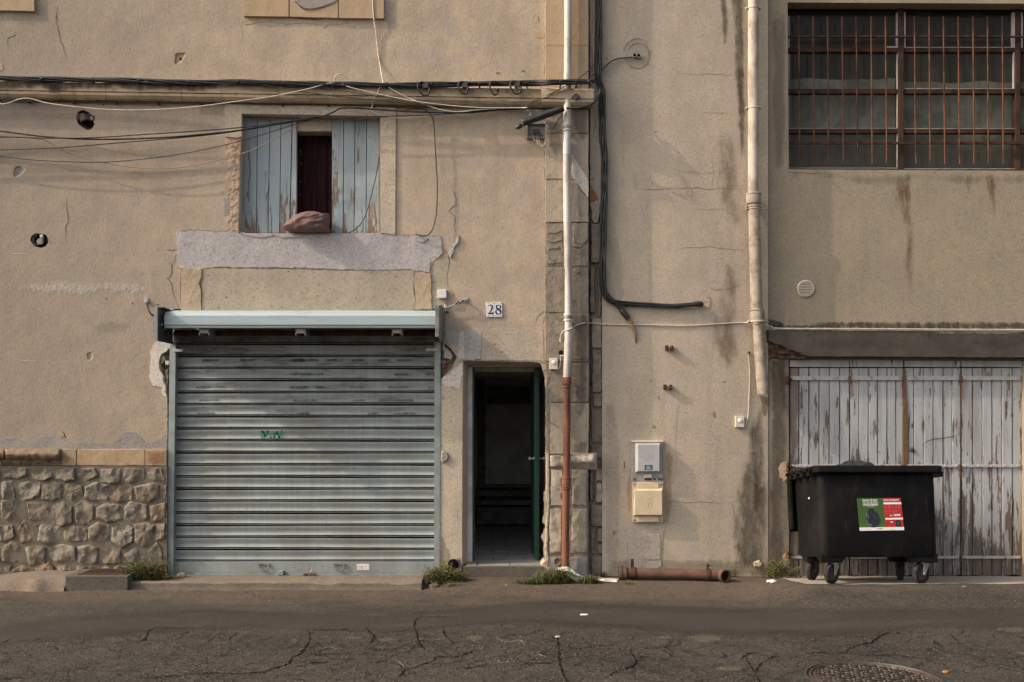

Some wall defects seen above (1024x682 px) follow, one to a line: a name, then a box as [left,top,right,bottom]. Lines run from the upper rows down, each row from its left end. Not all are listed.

spalling [224,138,306,238]
spalling [160,349,170,436]
leakage [739,362,785,569]